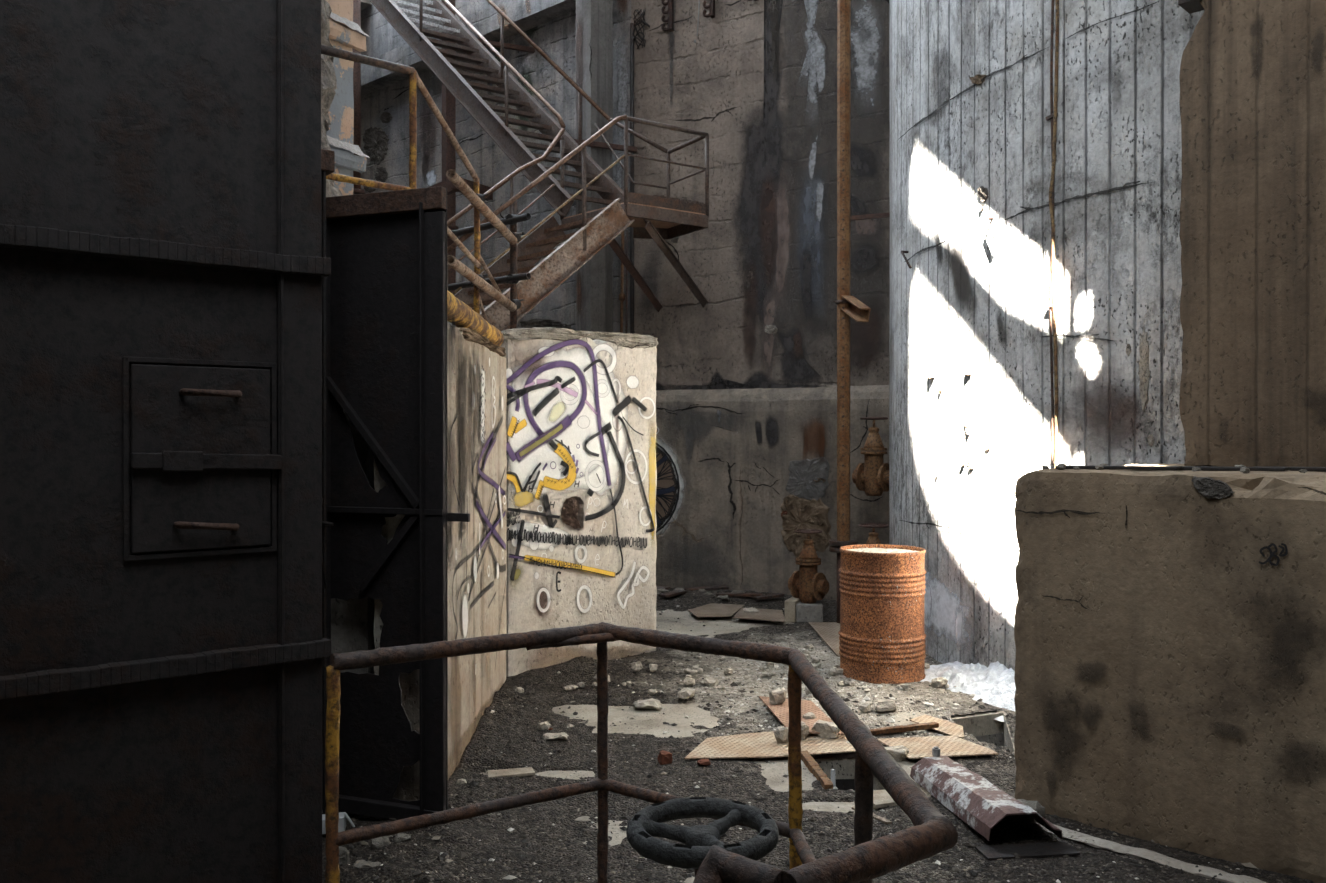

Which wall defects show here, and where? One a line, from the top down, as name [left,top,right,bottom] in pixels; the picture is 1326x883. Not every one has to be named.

crack [898,2,1157,140]
damp [656,0,825,391]
crack [998,181,1153,223]
crack [698,458,780,519]
spalling [1191,476,1235,499]